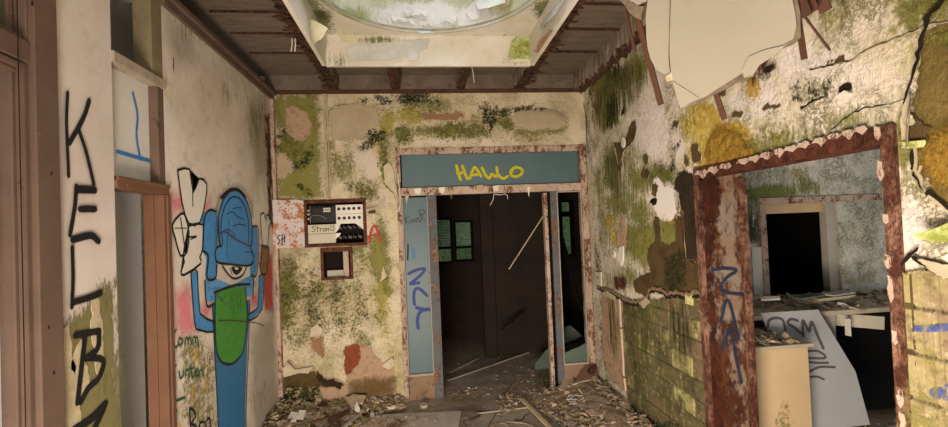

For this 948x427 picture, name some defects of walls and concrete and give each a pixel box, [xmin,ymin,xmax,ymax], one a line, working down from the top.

peeling [310,19,328,44]
peeling [339,0,506,62]
leakage [356,128,386,152]
leakage [355,95,441,107]
leakage [476,102,546,131]
spalling [682,61,776,110]
flaking render [899,23,948,242]
crack [909,149,948,210]
corrosion [699,176,750,427]
flaking render [282,324,396,407]
flaking render [596,285,706,427]
flaking render [902,254,948,427]